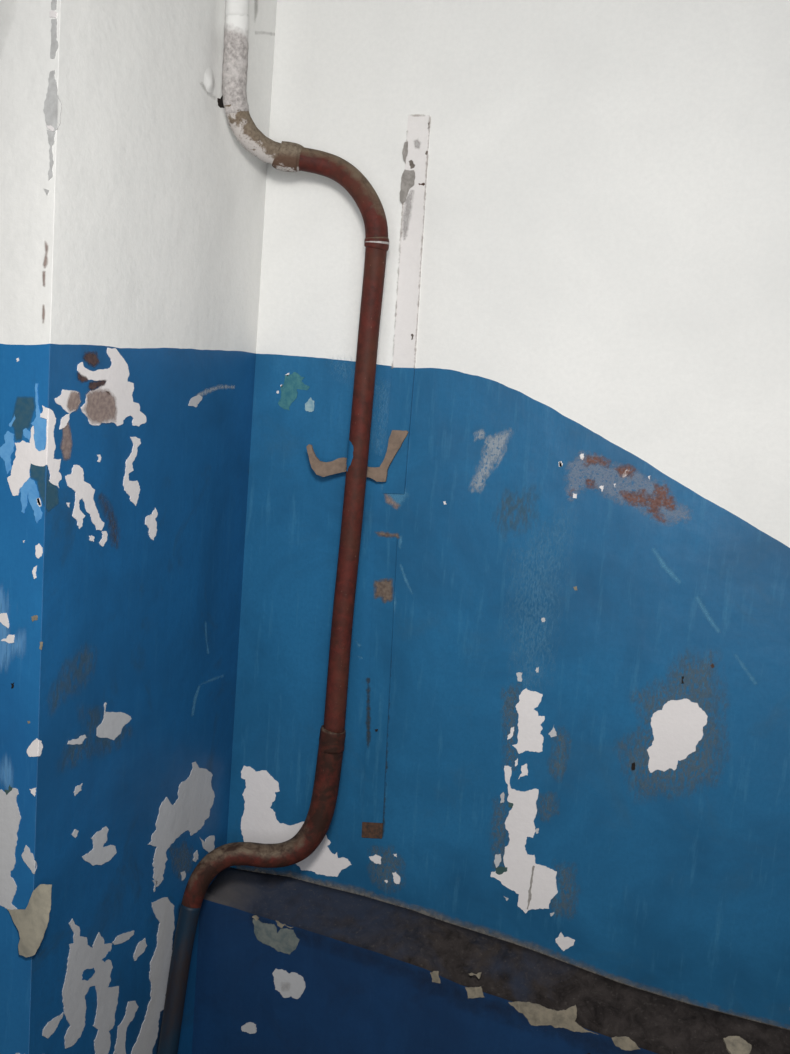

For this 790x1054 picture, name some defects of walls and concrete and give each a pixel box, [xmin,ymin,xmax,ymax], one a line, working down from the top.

peeling [0,348,146,547]
peeling [145,508,158,540]
rust [558,454,688,522]
peeling [27,738,43,757]
peeling [67,702,131,745]
peeling [621,656,718,794]
peeling [241,765,304,844]
peeling [491,672,572,916]
peeling [0,784,52,958]
peeling [42,762,215,1054]
peeling [296,835,351,877]
flaking render [508,1001,599,1035]